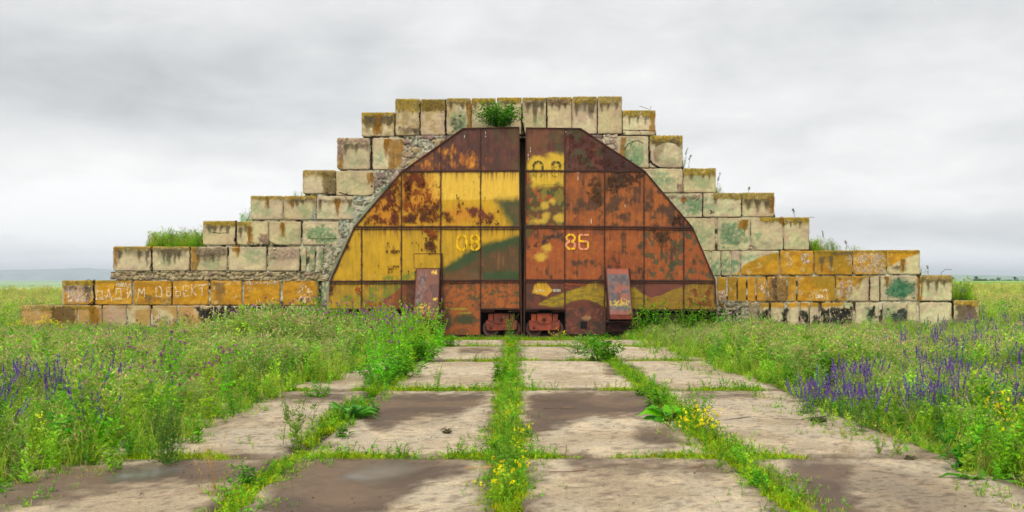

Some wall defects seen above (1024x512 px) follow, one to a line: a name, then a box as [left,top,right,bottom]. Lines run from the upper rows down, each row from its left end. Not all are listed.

damp [365,116,420,133]
corrosion [364,115,499,273]
corrosion [567,131,643,203]
damp [138,249,219,261]